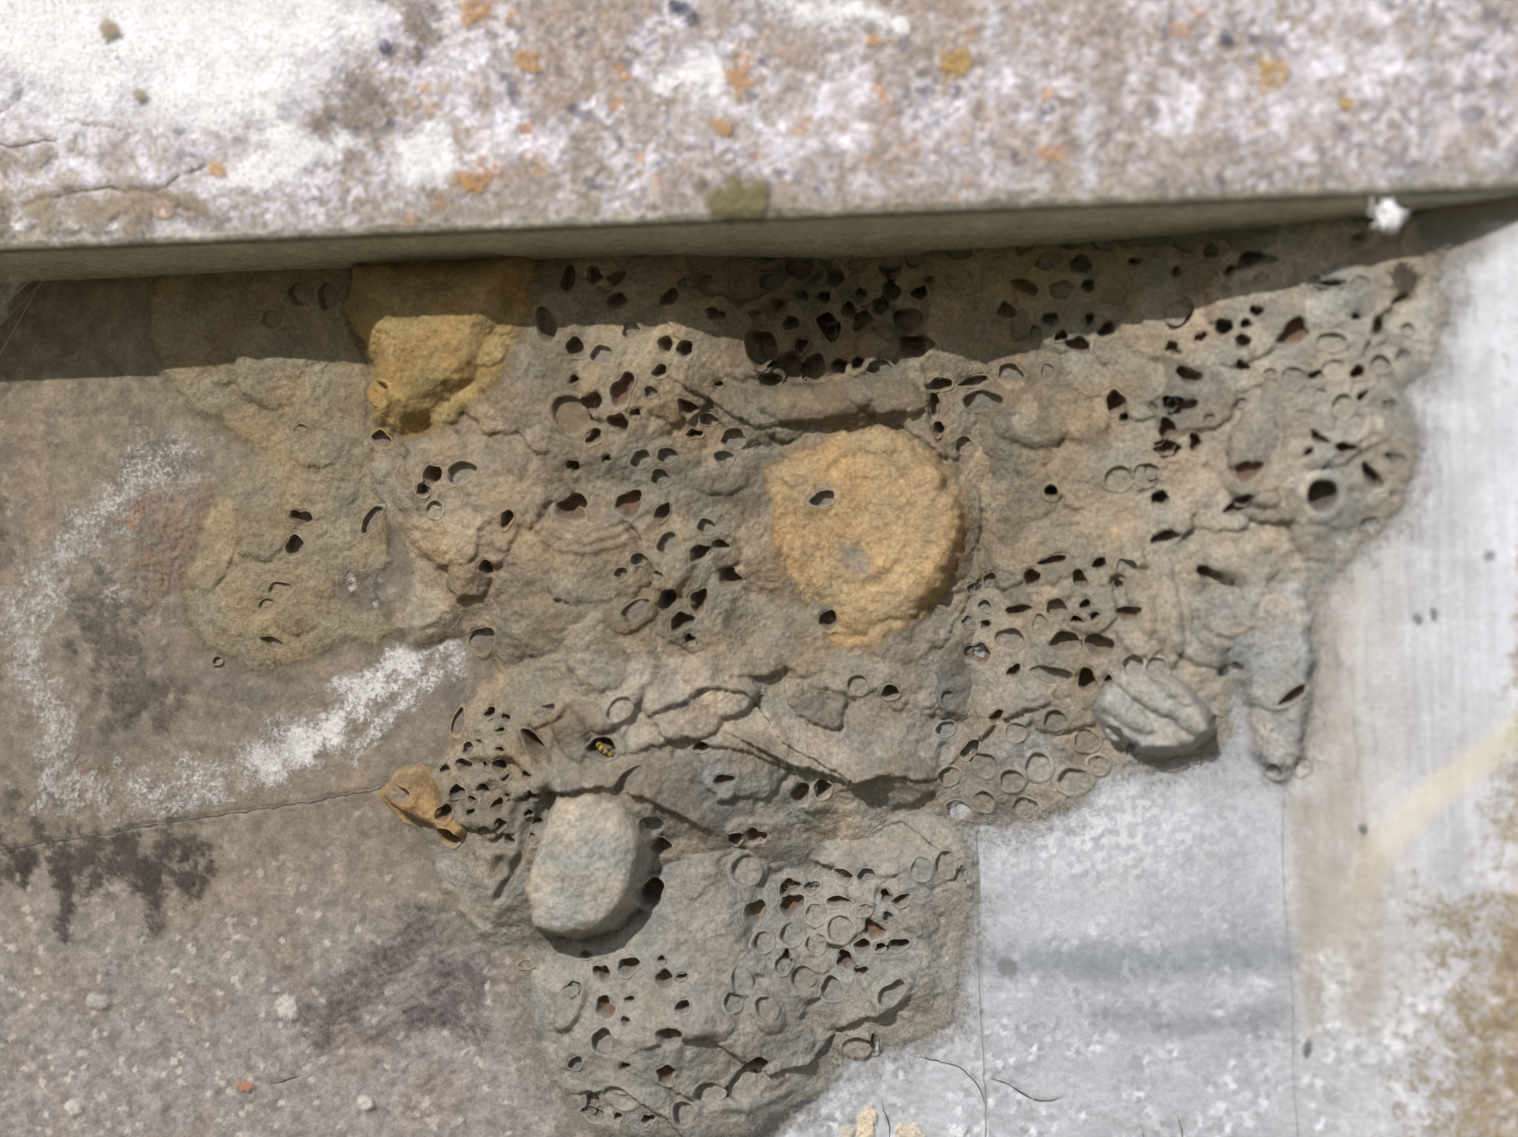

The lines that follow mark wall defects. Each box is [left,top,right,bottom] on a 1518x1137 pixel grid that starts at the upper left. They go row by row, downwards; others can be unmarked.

crack [0,108,203,211]
water stain [0,427,465,945]
crack [0,785,385,850]
spalling [276,898,492,1053]
spalling [998,959,1014,973]
spalling [358,1096,372,1109]
spalling [840,1103,876,1137]
spalling [947,1125,966,1137]